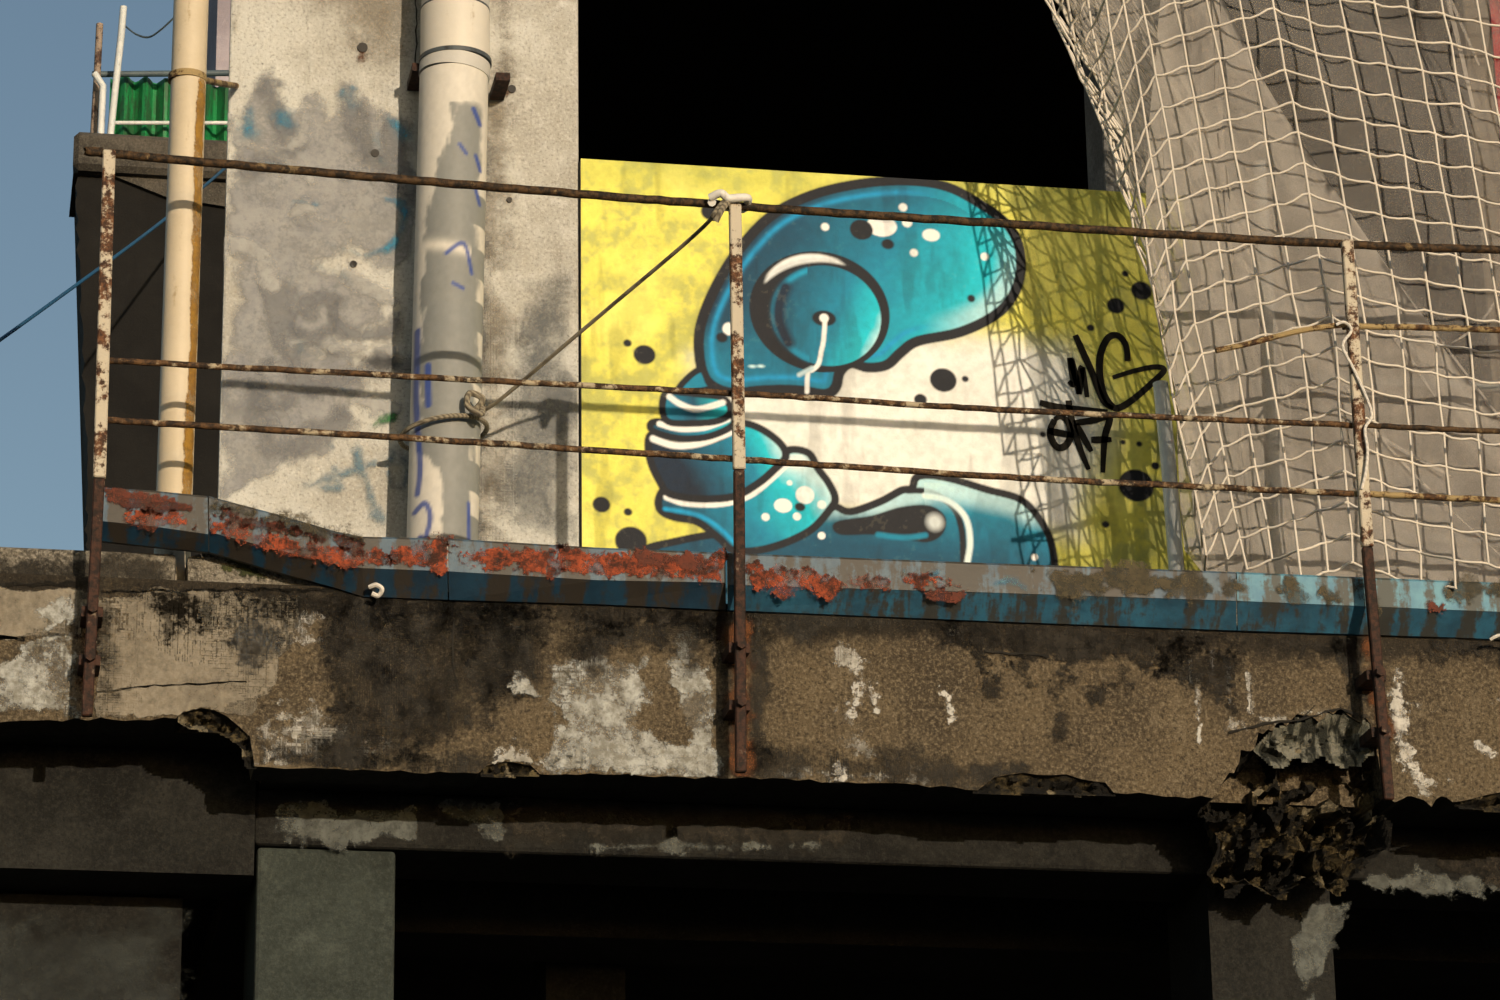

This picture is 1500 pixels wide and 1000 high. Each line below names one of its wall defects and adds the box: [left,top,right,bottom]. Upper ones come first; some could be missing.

rust [104,78,729,586]
rust [745,559,967,604]
peeling [0,596,81,718]
spalling [178,710,257,769]
peeling [481,629,723,778]
damp [0,552,1370,790]
rust [724,663,755,777]
damp [1387,669,1450,796]
peeling [274,799,418,852]
peeling [437,798,507,841]
spalling [1197,710,1393,1000]